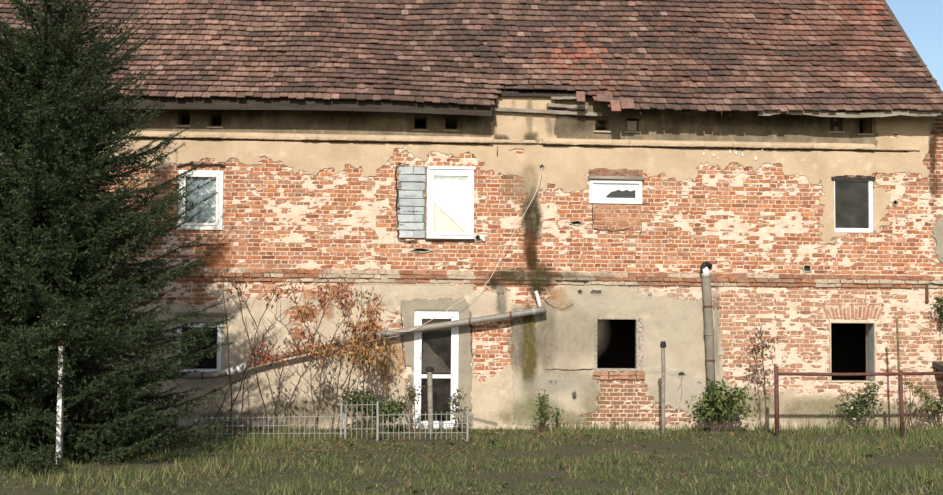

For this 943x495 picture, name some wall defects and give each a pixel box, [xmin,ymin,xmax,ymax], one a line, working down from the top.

flaking render [91,115,943,425]
leakage [523,199,540,269]